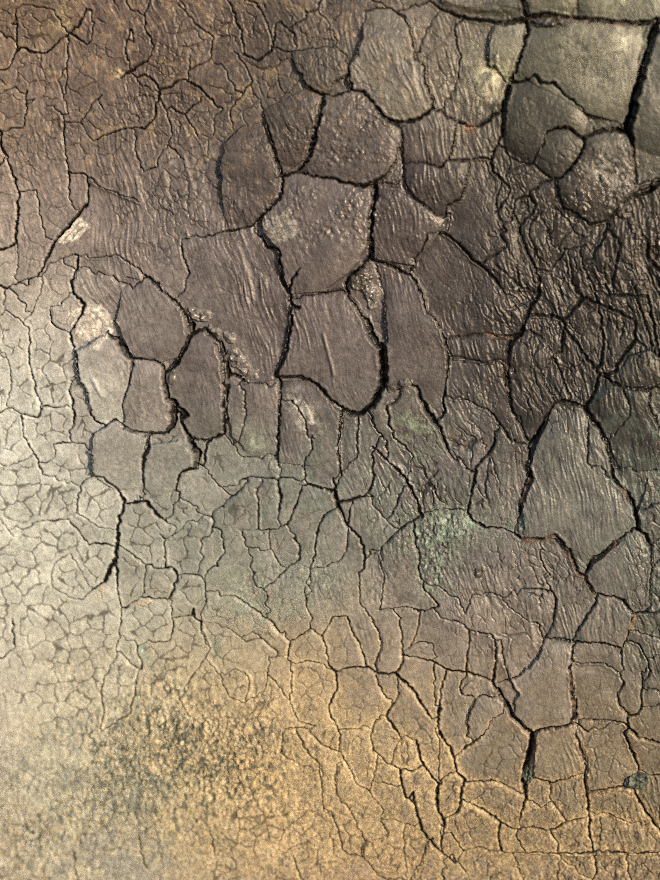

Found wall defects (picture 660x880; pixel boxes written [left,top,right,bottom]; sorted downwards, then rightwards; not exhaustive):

crack [0,0,260,734]
crack [194,0,660,880]